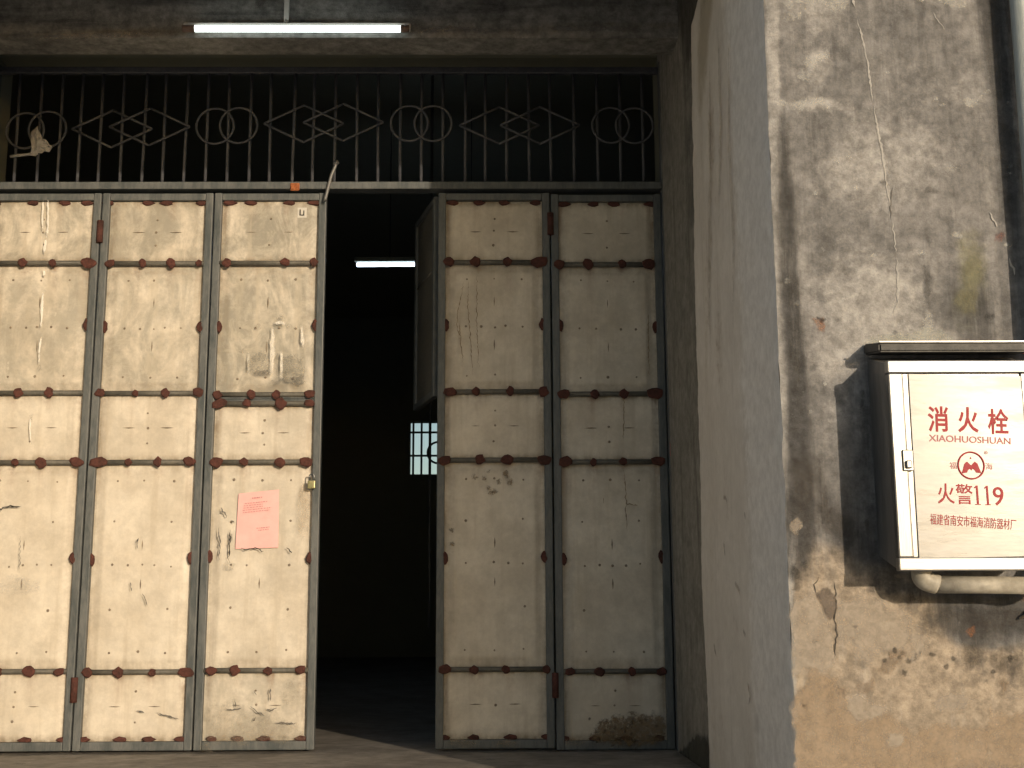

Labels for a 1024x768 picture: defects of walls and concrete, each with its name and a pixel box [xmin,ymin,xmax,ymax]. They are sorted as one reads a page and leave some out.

crack [852,0,901,310]